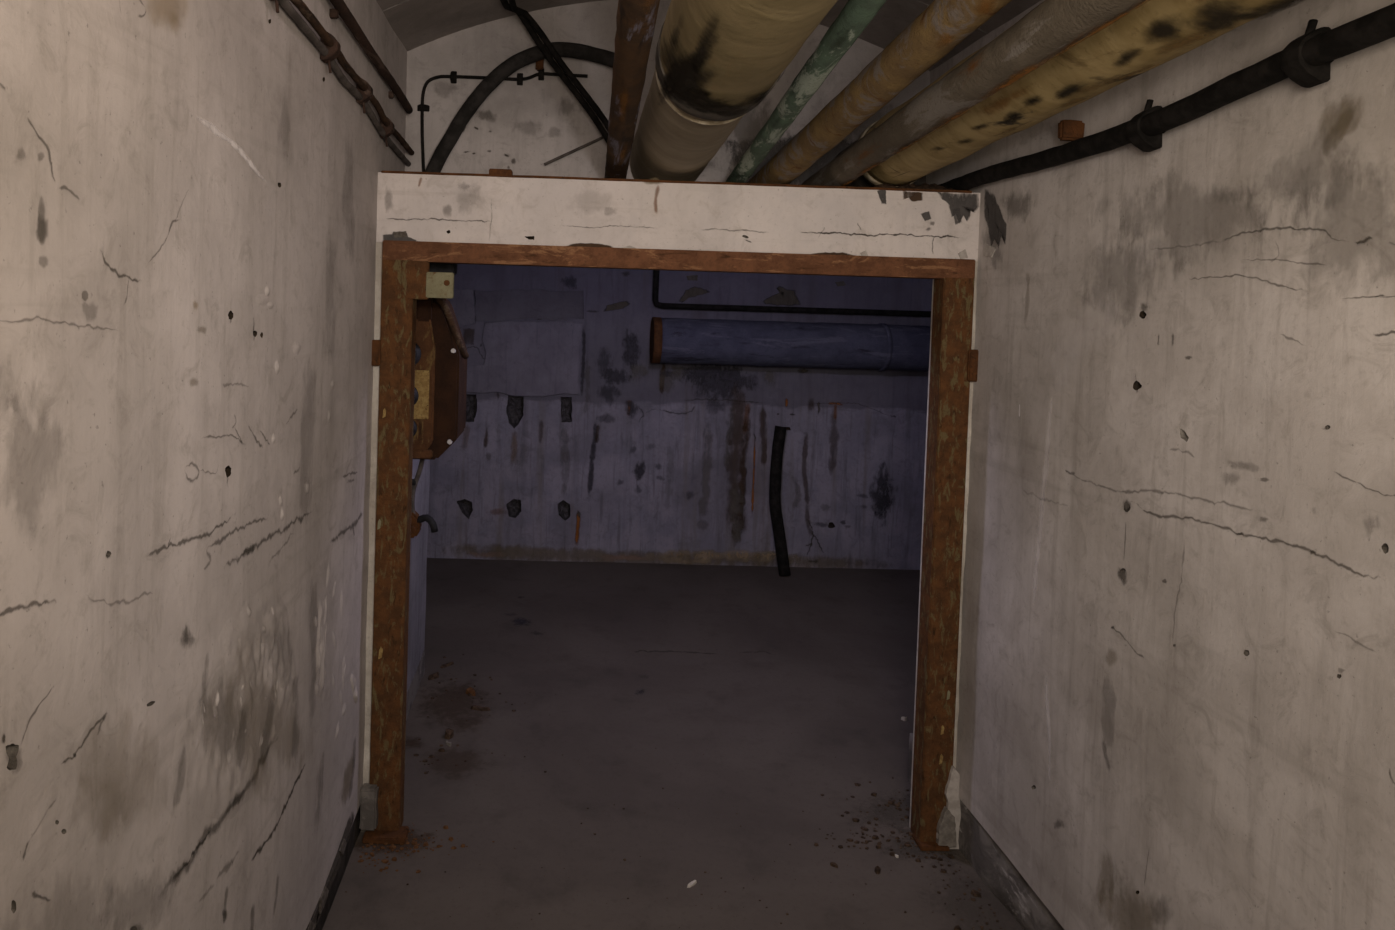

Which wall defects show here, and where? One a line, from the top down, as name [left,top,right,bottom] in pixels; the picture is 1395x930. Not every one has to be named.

spalling [904,191,1006,259]
crack [152,521,227,554]
crack [240,518,303,557]
crack [1147,512,1361,575]
crack [253,765,305,859]
crack [175,836,207,878]